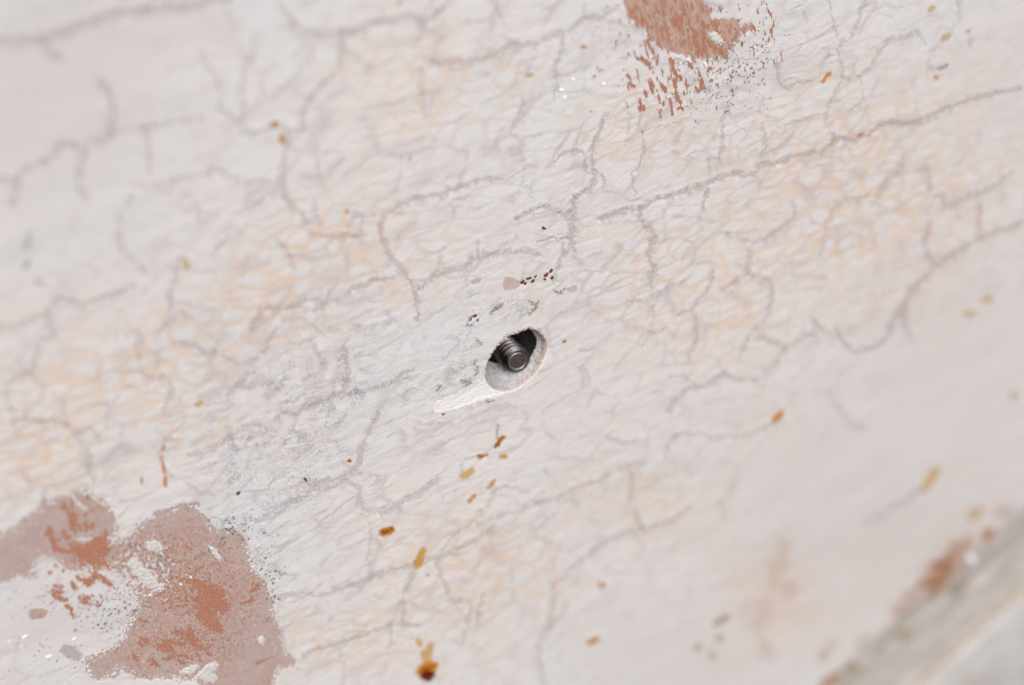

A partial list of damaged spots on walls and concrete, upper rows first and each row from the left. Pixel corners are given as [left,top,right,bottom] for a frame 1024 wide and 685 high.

peeling [594,0,790,127]
corrosion [460,436,507,478]
corrosion [379,526,395,537]
corrosion [414,548,426,568]
peeling [0,488,308,685]
corrosion [416,638,438,681]